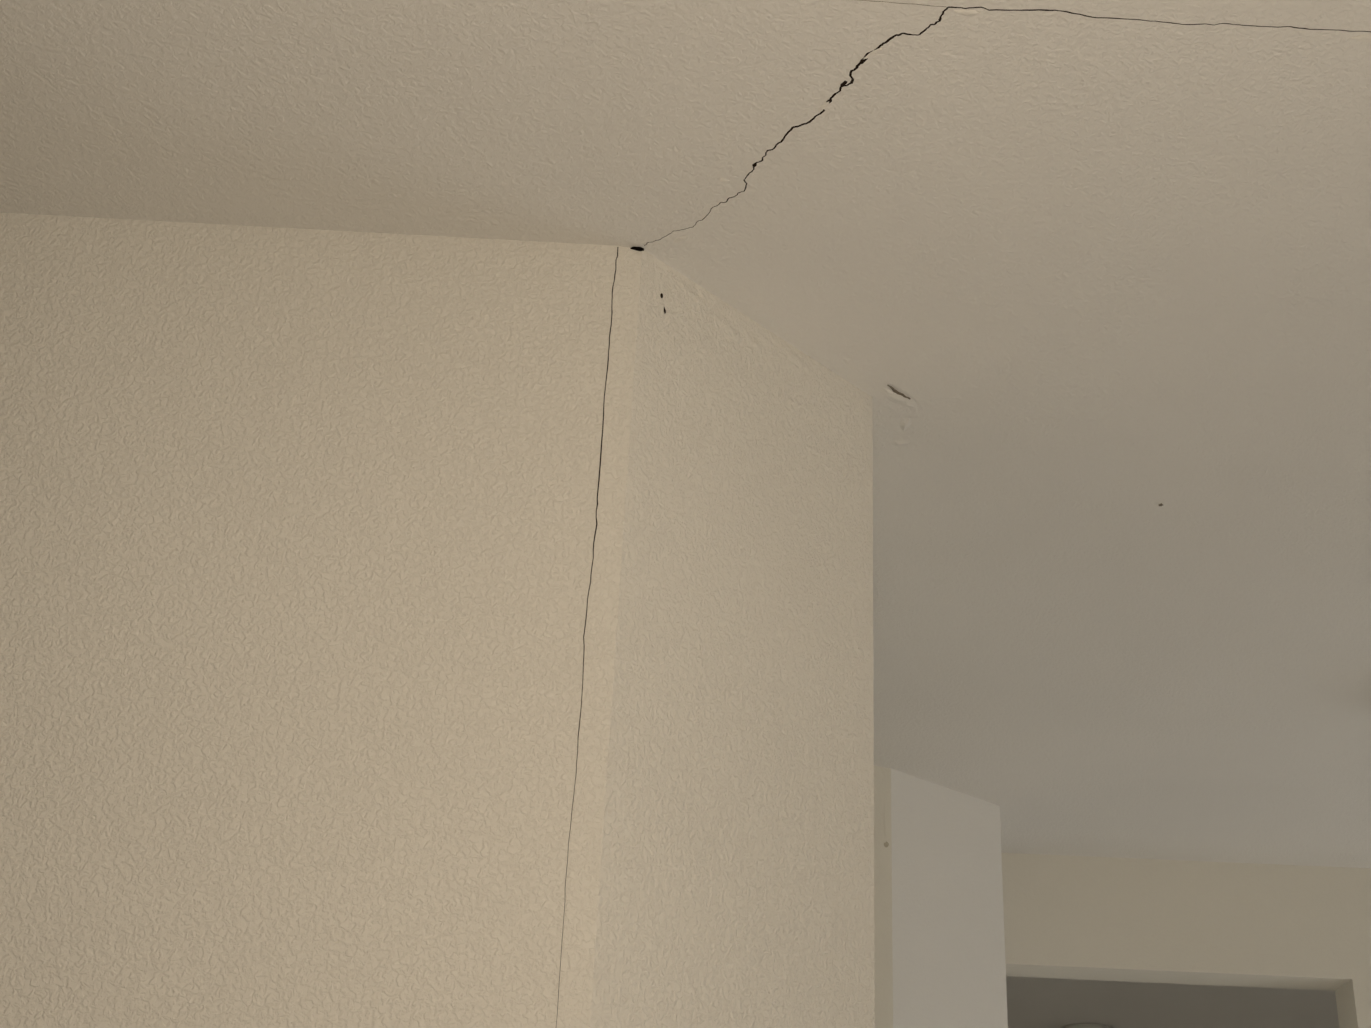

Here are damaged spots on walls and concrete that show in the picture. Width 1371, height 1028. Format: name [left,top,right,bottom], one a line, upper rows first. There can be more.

crack [556,0,1371,1025]